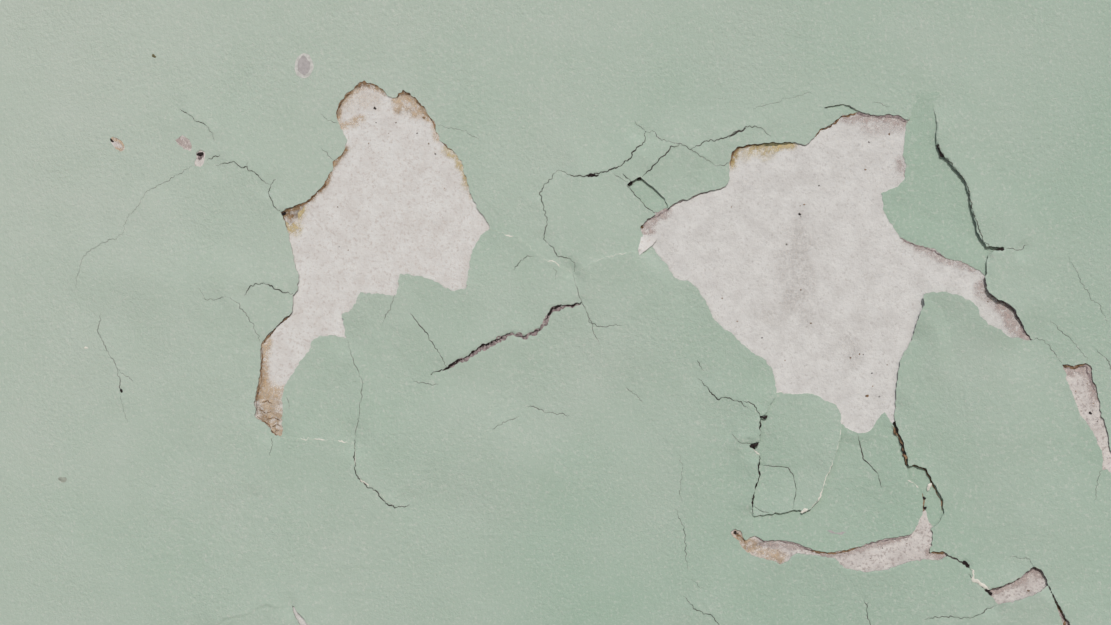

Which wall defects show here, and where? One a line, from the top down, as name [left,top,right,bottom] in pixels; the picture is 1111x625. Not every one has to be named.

crack [97,316,132,417]
crack [76,109,280,281]
crack [200,283,291,340]
crack [269,359,406,508]
peeling [254,82,490,435]
crack [383,93,806,385]
peeling [638,111,1032,433]
crack [937,143,1025,251]
peeling [1065,363,1111,473]
peeling [731,510,947,572]
peeling [990,569,1070,625]